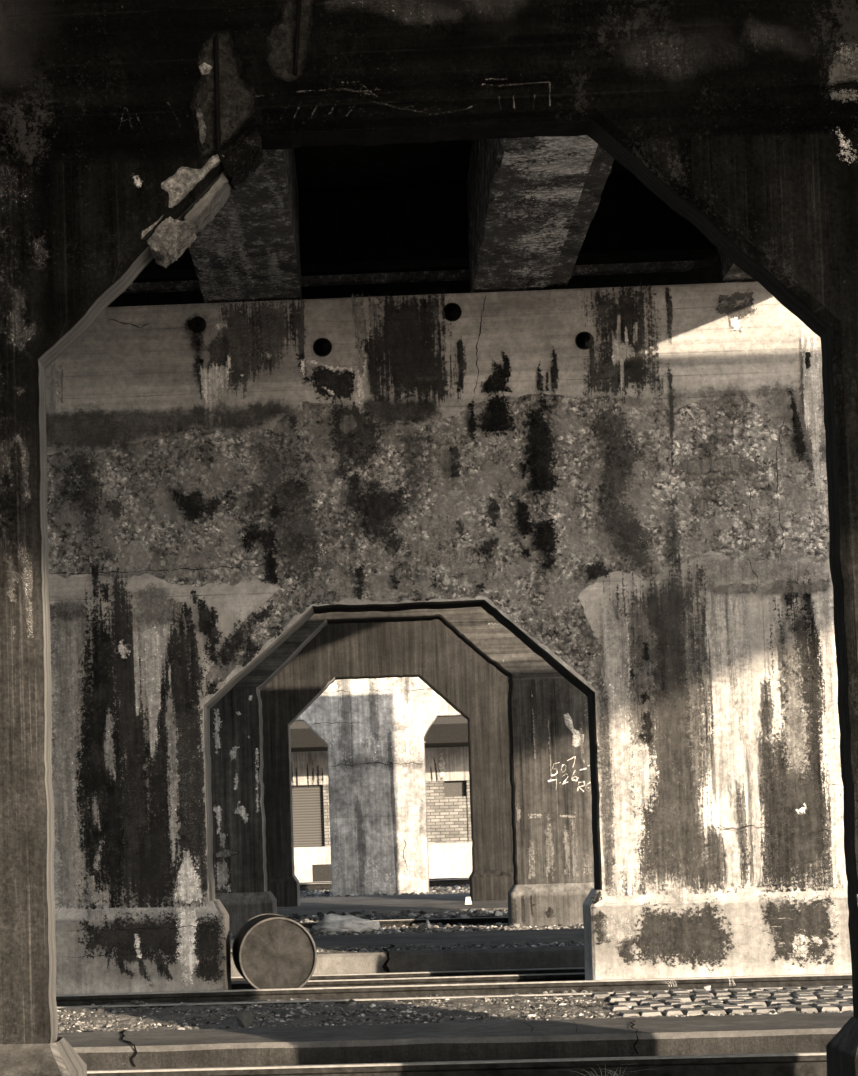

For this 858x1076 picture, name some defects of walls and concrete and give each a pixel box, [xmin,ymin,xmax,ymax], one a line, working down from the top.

spalling [825,45,858,86]
spalling [141,30,285,299]
peeling [494,135,598,288]
water stain [196,293,383,424]
water stain [700,324,826,505]
peeling [10,556,33,638]
spalling [47,392,829,697]
water stain [51,563,111,930]
water stain [107,587,231,987]
water stain [679,555,846,893]
crack [120,1030,137,1067]
crack [626,1018,639,1055]